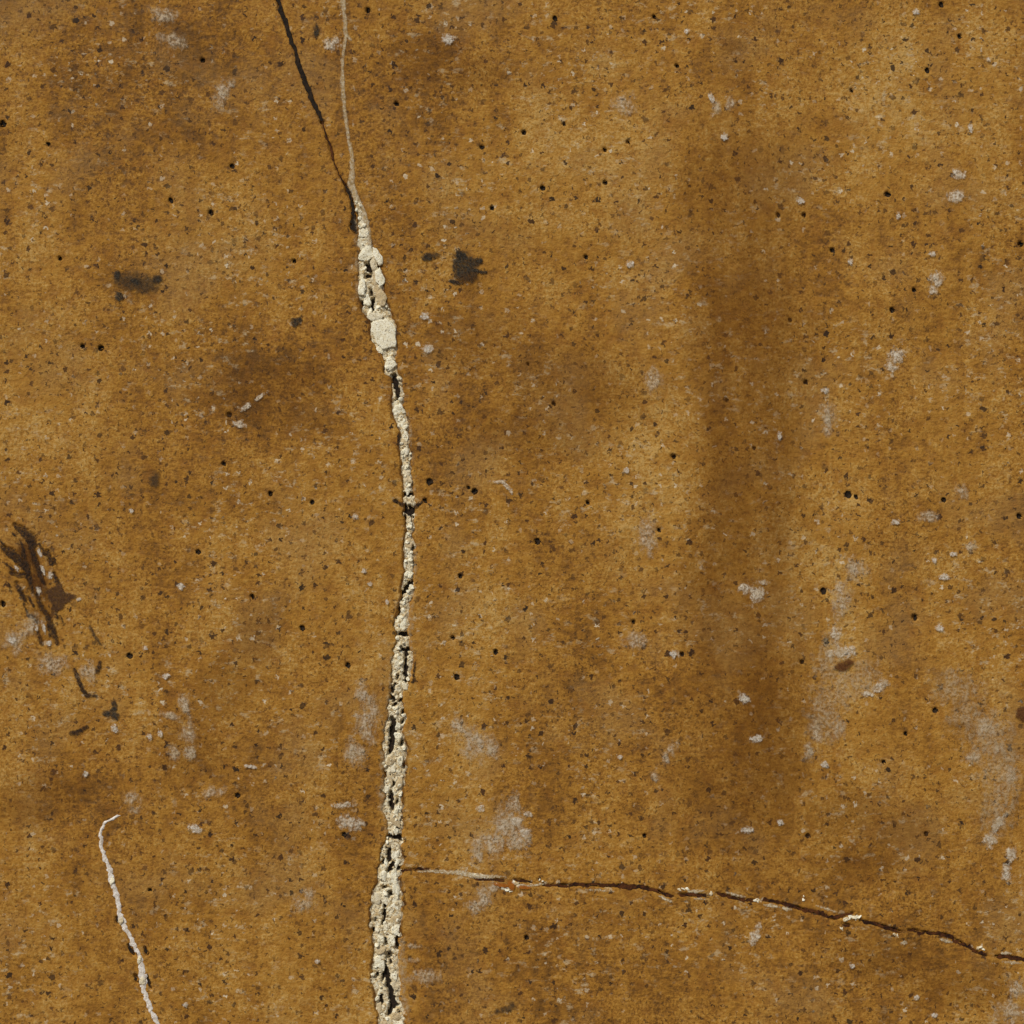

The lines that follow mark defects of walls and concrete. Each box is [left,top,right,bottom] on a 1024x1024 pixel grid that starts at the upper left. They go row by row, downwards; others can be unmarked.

damp [450,251,487,284]
damp [114,270,162,301]
crack [276,0,1024,1024]
damp [102,701,119,720]
crack [98,815,160,1024]